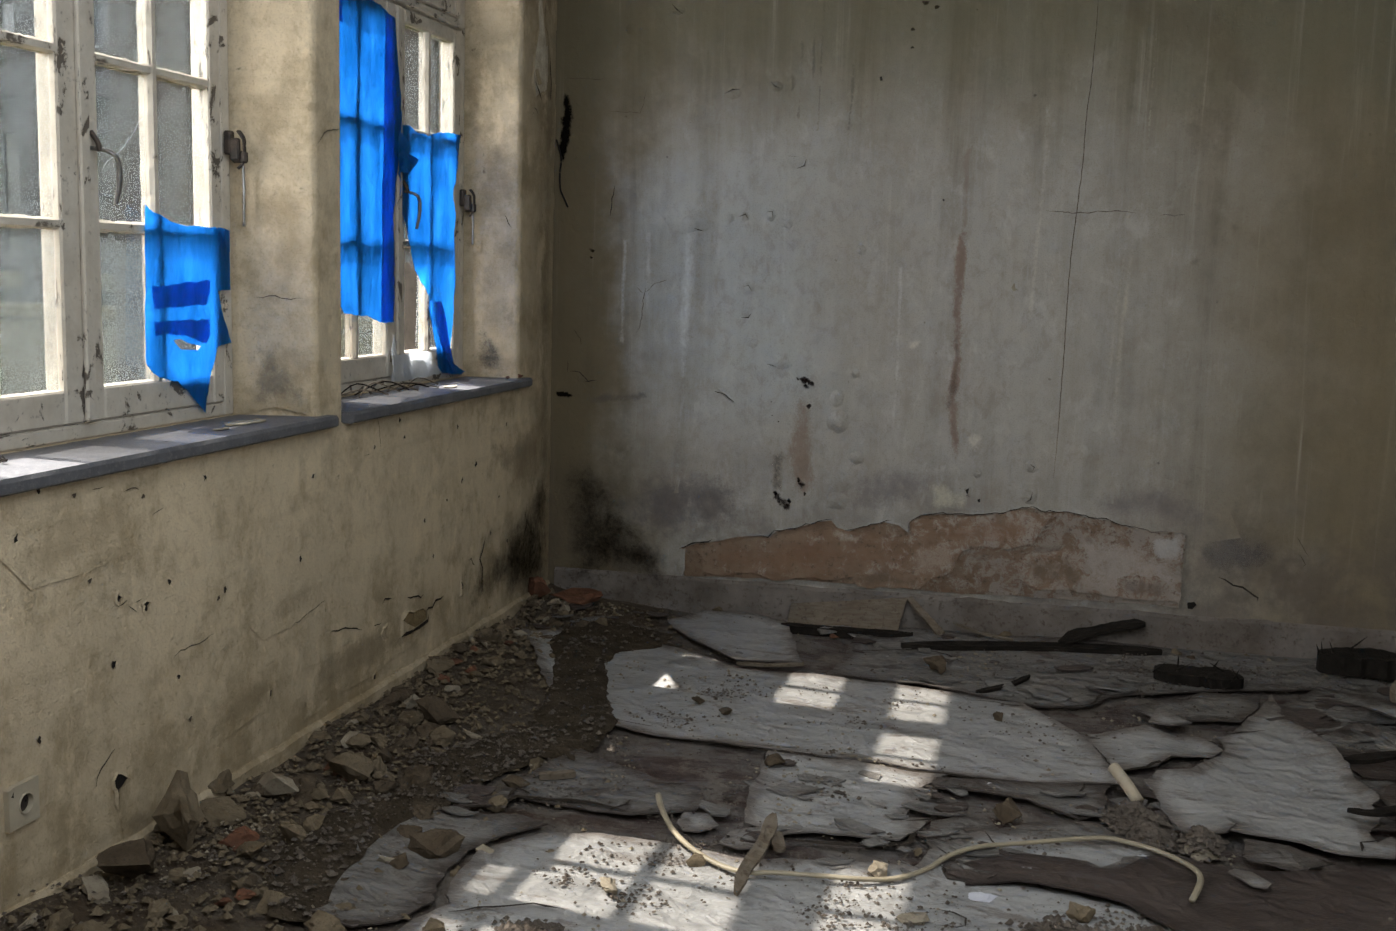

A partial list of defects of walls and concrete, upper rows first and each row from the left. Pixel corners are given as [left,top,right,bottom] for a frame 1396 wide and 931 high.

corrosion [943,146,973,470]
crack [759,0,1182,538]
flaking render [677,486,1199,611]